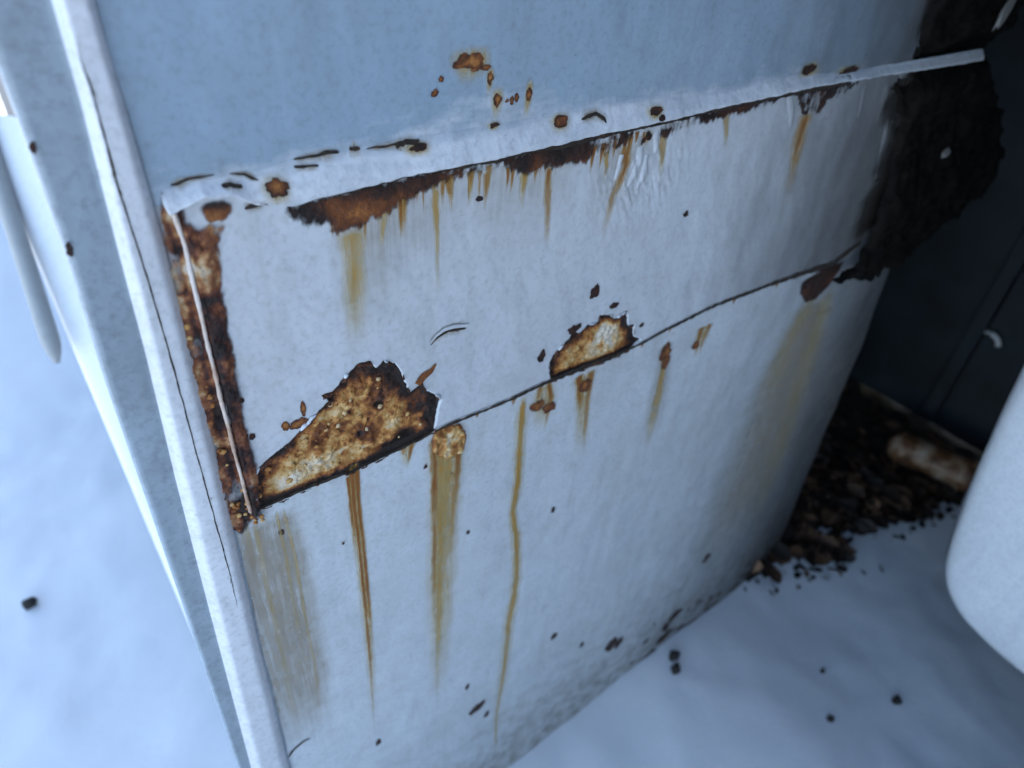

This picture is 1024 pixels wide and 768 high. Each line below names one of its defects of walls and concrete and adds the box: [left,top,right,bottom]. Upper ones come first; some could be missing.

rust [660,122,674,163]
rust [687,100,777,138]
rust [792,81,859,167]
rust [287,131,645,303]
peeling [537,302,644,382]
rust [161,201,319,710]
peeling [256,360,441,510]
rust [346,464,372,685]
rust [430,424,466,643]
peeling [605,636,623,652]
peeling [629,536,774,665]
peeling [468,700,489,718]